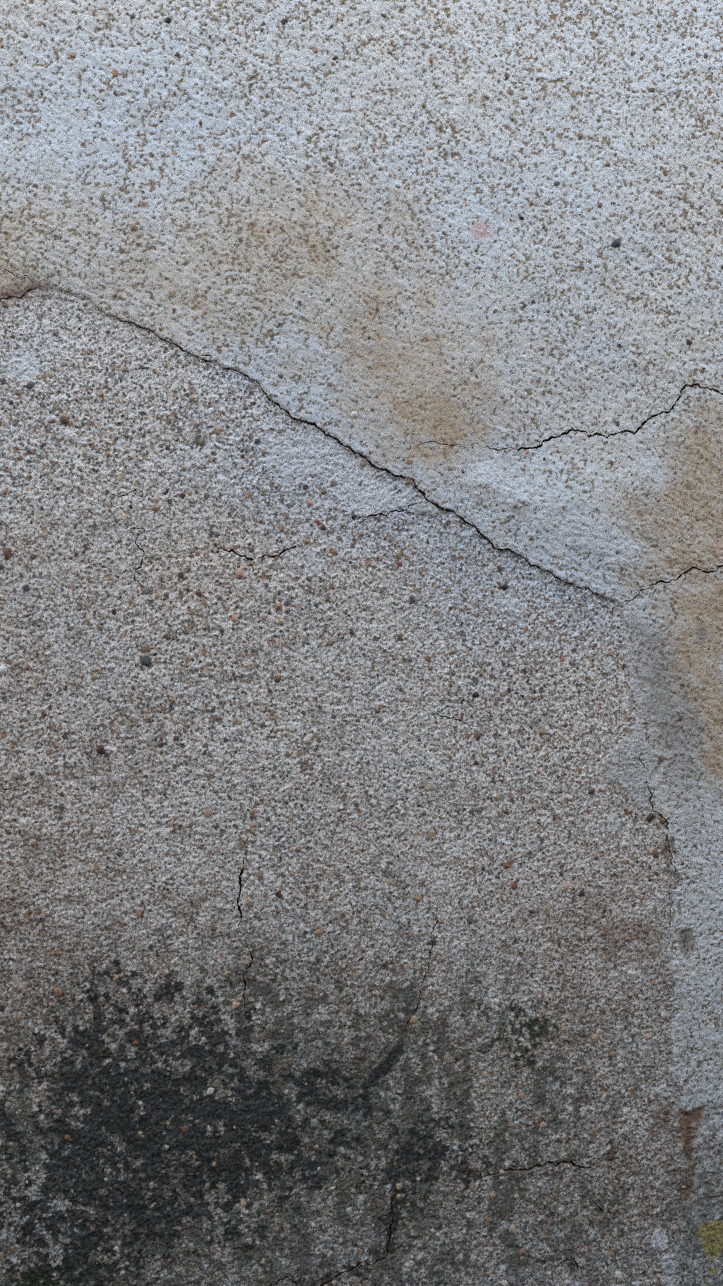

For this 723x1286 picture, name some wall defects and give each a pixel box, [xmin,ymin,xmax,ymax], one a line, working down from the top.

crack [0,267,723,608]
spalling [0,256,700,1286]
crack [433,712,466,724]
crack [637,754,679,951]
damp [0,918,510,1286]